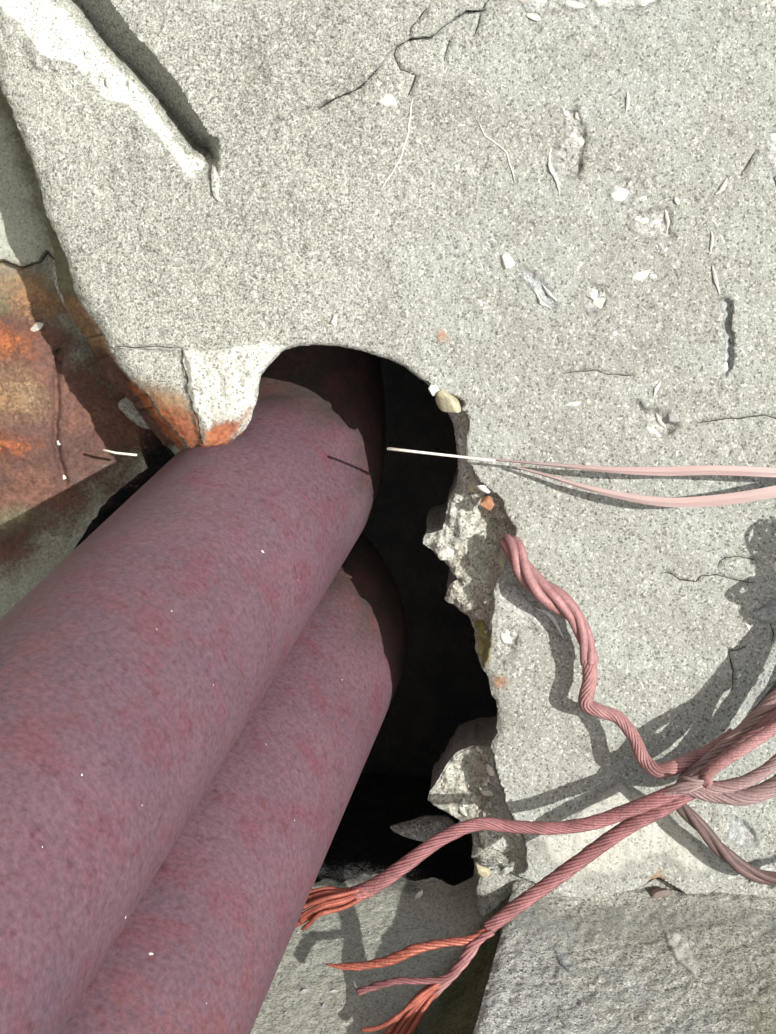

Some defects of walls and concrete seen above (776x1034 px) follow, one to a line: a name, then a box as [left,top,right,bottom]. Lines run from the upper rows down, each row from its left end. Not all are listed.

crack [318,0,489,190]
crack [478,122,515,182]
rust [0,262,247,573]
peeling [183,342,280,445]
crack [698,415,776,423]
spalling [426,383,564,669]
crack [659,556,755,584]
spalling [430,745,529,883]
damp [413,896,510,1034]